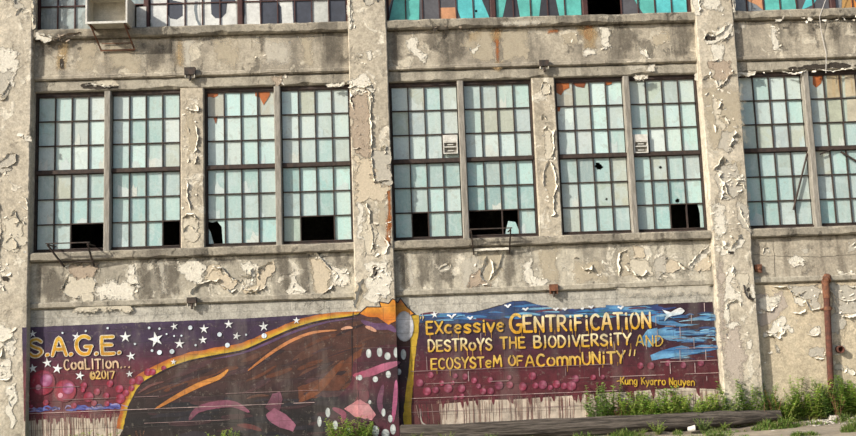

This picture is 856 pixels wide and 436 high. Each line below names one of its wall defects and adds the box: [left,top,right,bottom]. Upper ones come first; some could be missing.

peeling [346,0,355,30]
peeling [561,26,612,57]
peeling [0,47,22,109]
peeling [0,151,18,176]
peeling [286,50,394,309]
peeling [573,0,856,387]
peeling [0,196,28,255]
peeling [61,262,140,313]
peeling [175,257,275,295]
peeling [461,252,505,288]
peeling [0,324,18,429]